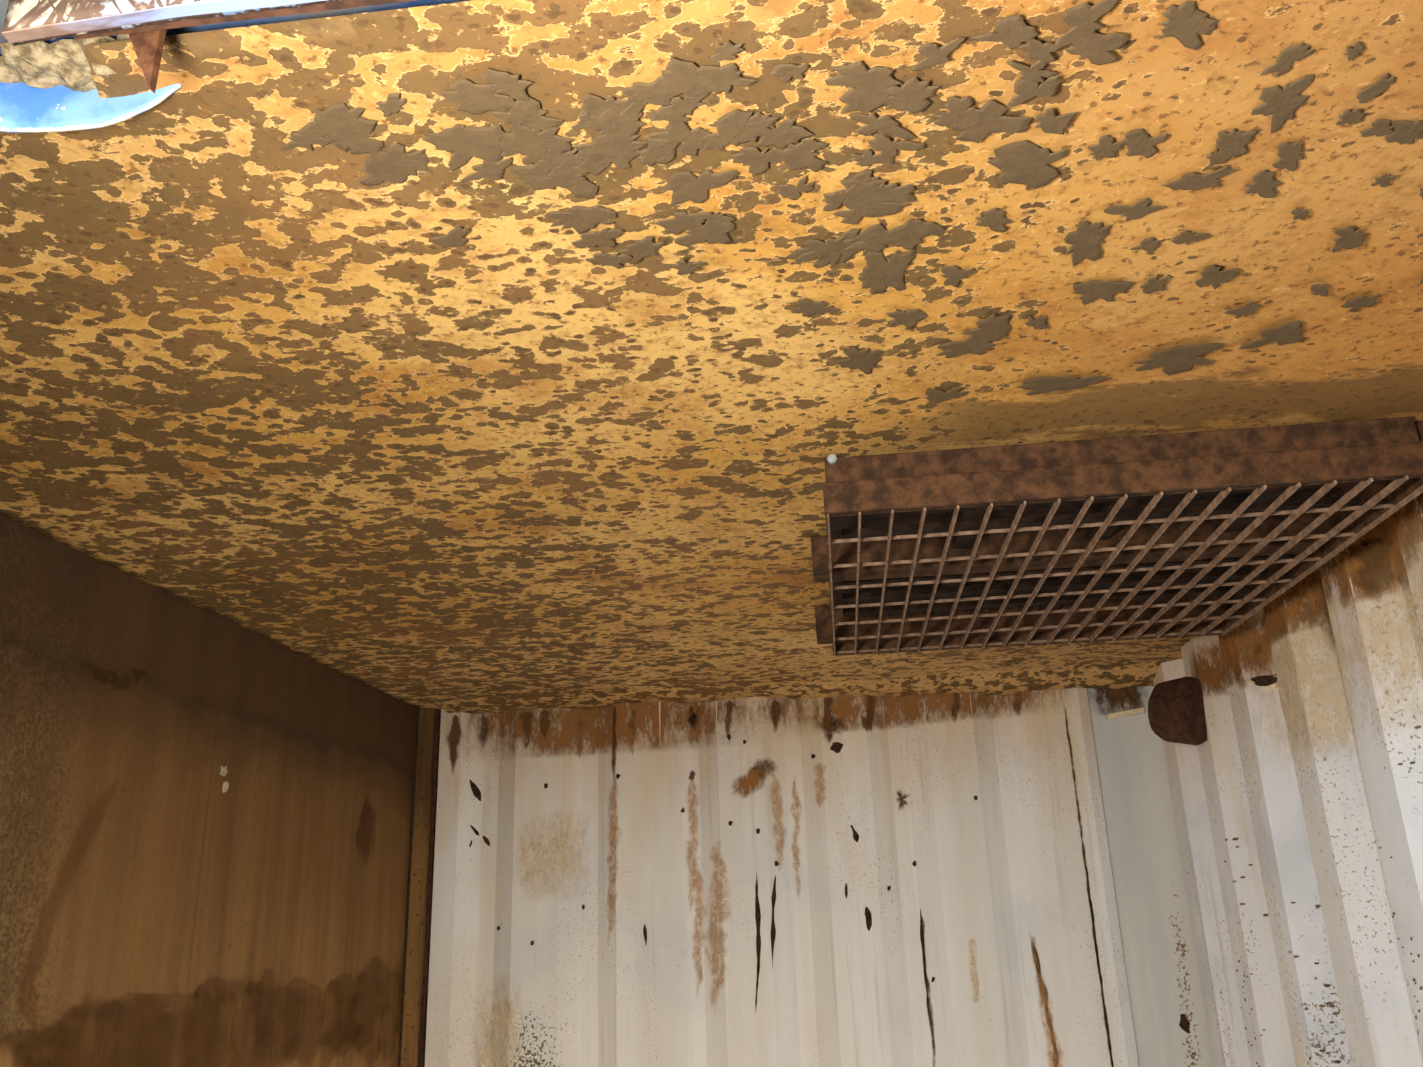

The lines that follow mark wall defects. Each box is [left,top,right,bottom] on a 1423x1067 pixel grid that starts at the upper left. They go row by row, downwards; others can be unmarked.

peeling [1157,1,1219,50]
peeling [281,0,1127,295]
peeling [1087,129,1169,161]
peeling [1160,44,1315,198]
peeling [1335,73,1423,145]
peeling [1064,198,1167,267]
peeling [1073,277,1171,305]
corrosion [1194,492,1423,692]
corrosion [448,699,744,775]
corrosion [771,690,1048,753]
corrosion [1097,687,1143,713]
corrosion [1031,937,1058,1067]